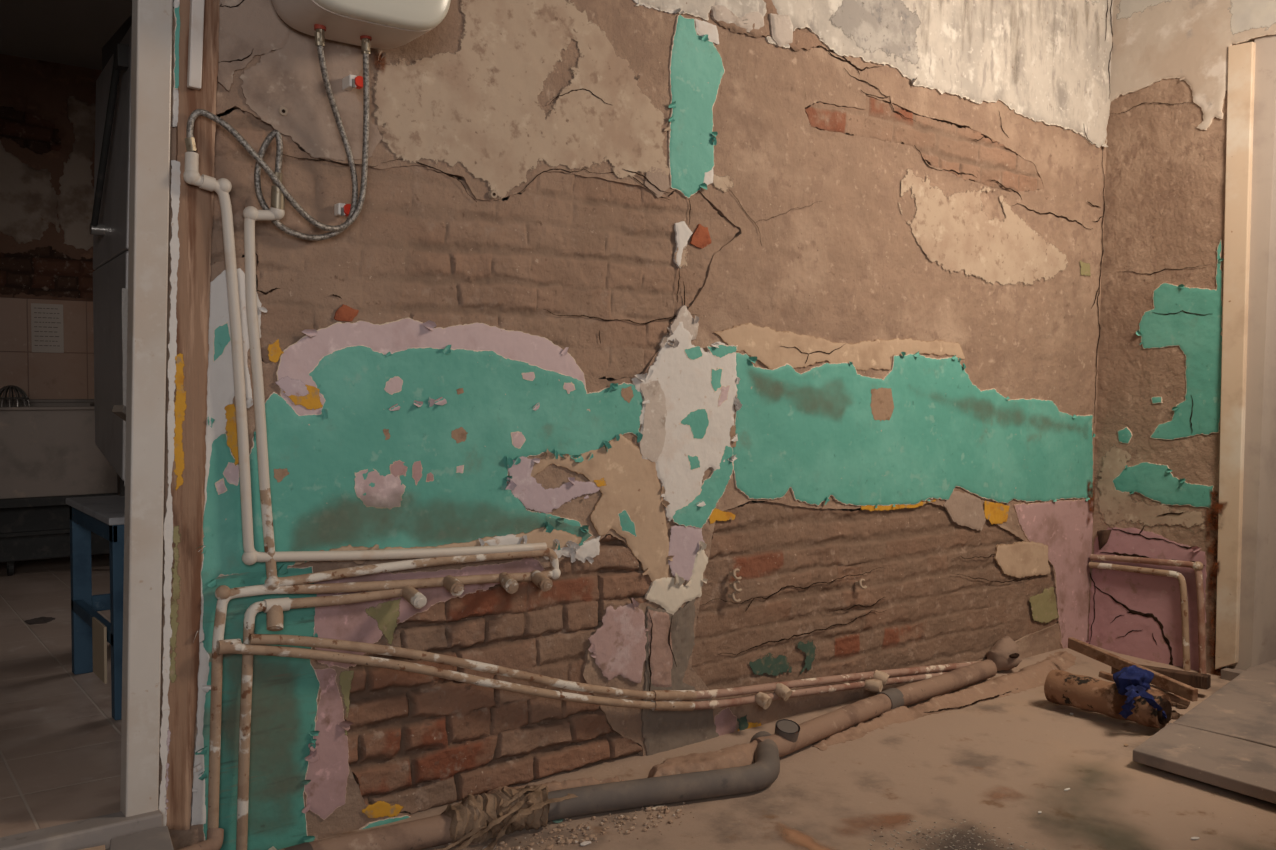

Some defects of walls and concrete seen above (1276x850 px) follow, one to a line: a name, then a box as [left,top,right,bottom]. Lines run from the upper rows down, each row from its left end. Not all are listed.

peeling [171,0,180,127]
flaking render [0,96,96,300]
crack [817,0,1210,423]
flaking render [214,0,1276,694]
peeling [191,191,267,850]
crack [1089,512,1205,665]
flaking render [247,645,643,850]